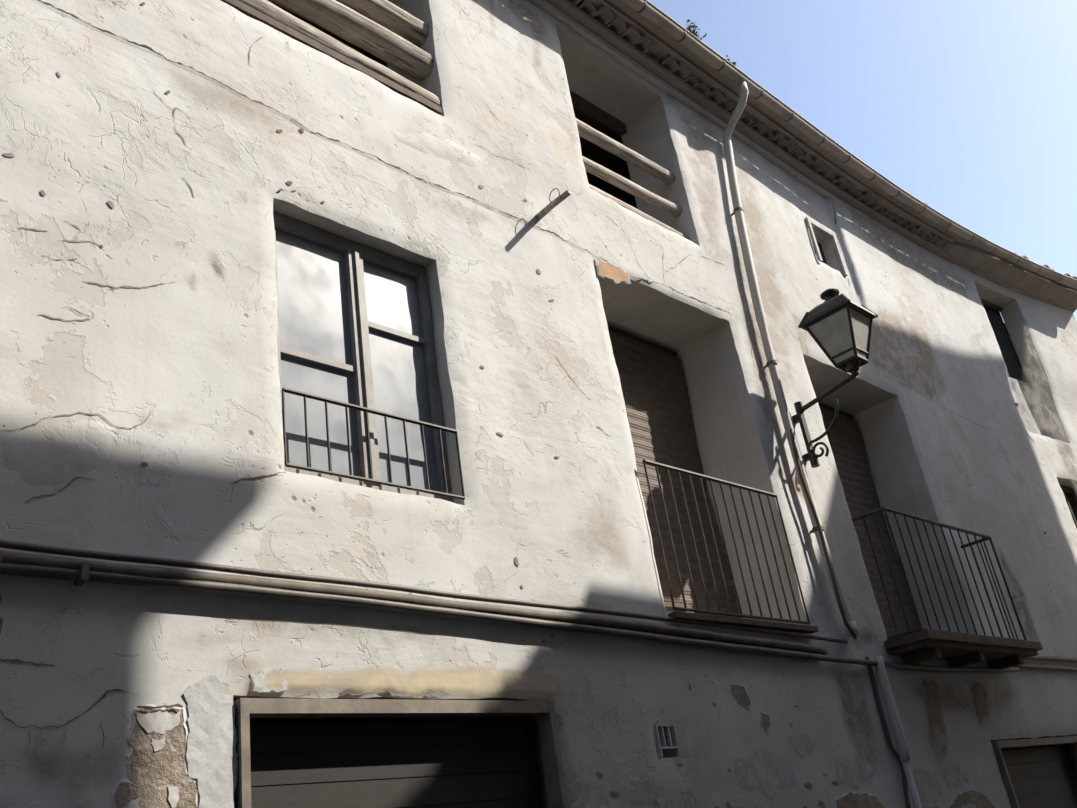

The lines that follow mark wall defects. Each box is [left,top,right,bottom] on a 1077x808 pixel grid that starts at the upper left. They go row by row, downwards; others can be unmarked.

crack [2,0,739,315]
flaking render [595,259,631,284]
crack [8,411,151,431]
crack [25,476,96,504]
crack [0,689,138,751]
flaking render [729,683,771,733]
flaking render [110,704,198,808]
flaking render [803,773,885,808]
flaking render [921,788,995,808]